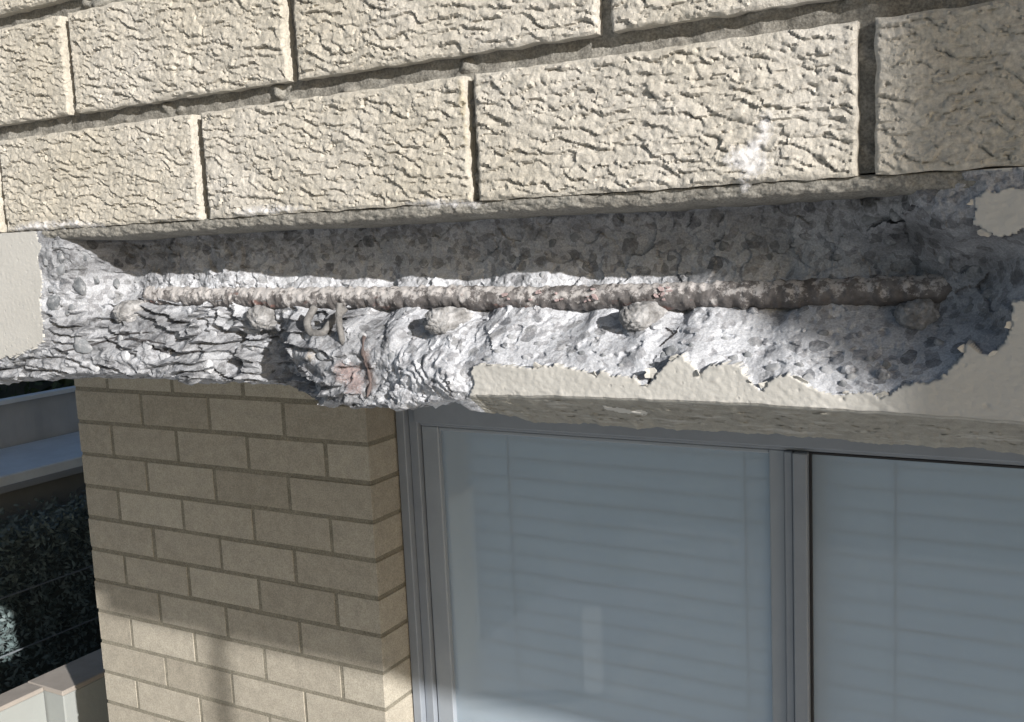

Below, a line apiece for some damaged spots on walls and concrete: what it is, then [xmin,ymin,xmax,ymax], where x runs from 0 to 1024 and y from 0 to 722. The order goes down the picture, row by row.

spalling [0,167,1024,413]
spalling [602,405,648,415]